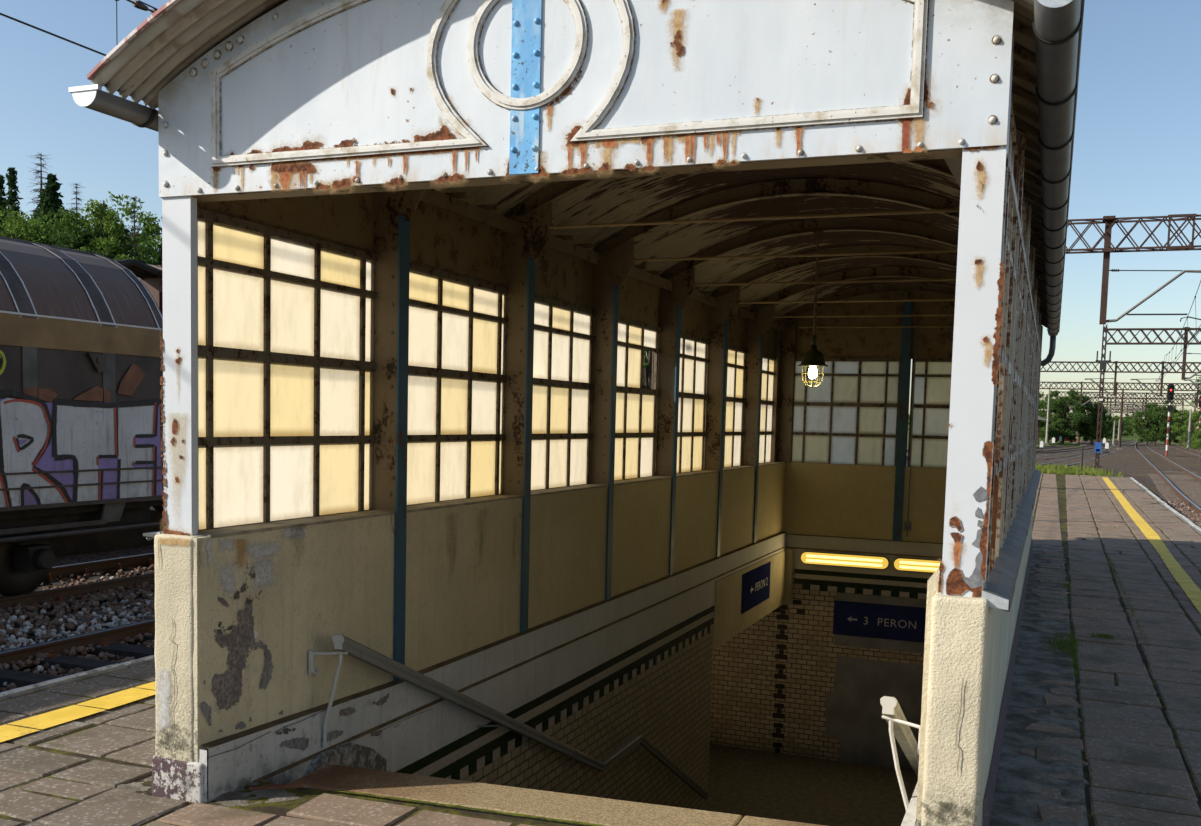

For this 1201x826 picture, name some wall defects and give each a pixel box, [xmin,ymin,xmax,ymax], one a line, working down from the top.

rust [661,0,684,57]
rust [213,122,479,190]
rust [899,79,934,153]
rust [964,145,1006,195]
rust [159,337,190,545]
peeling [946,441,994,598]
spalling [200,562,273,732]
crack [952,679,964,777]